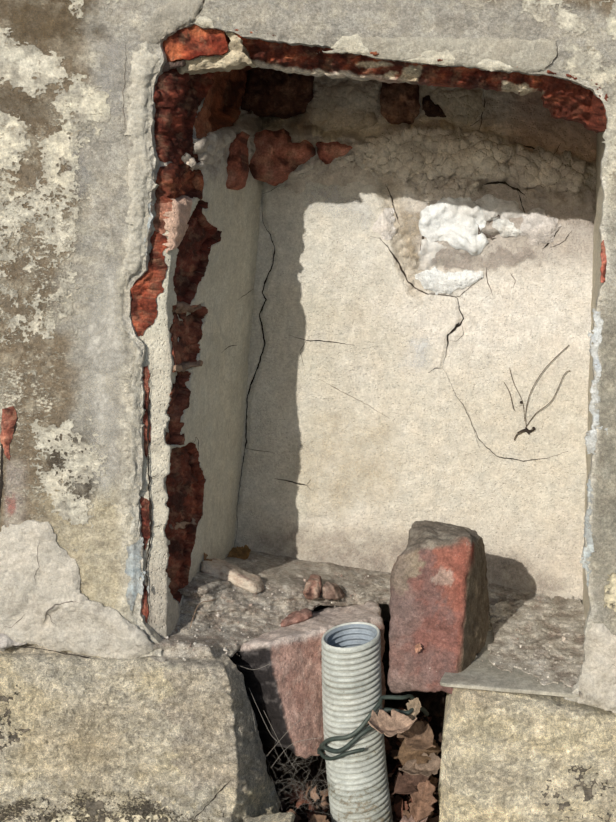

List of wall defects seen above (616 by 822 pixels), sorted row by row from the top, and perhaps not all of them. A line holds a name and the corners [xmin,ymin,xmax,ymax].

flaking render [331,34,369,54]
spalling [380,82,446,125]
flaking render [406,50,455,65]
crack [477,215,500,239]
crack [484,181,527,213]
damp [88,265,120,366]
spalling [123,41,353,623]
crack [235,186,278,540]
crack [371,236,568,462]
peeling [585,308,608,455]
damp [48,435,95,499]
peeling [580,479,616,618]